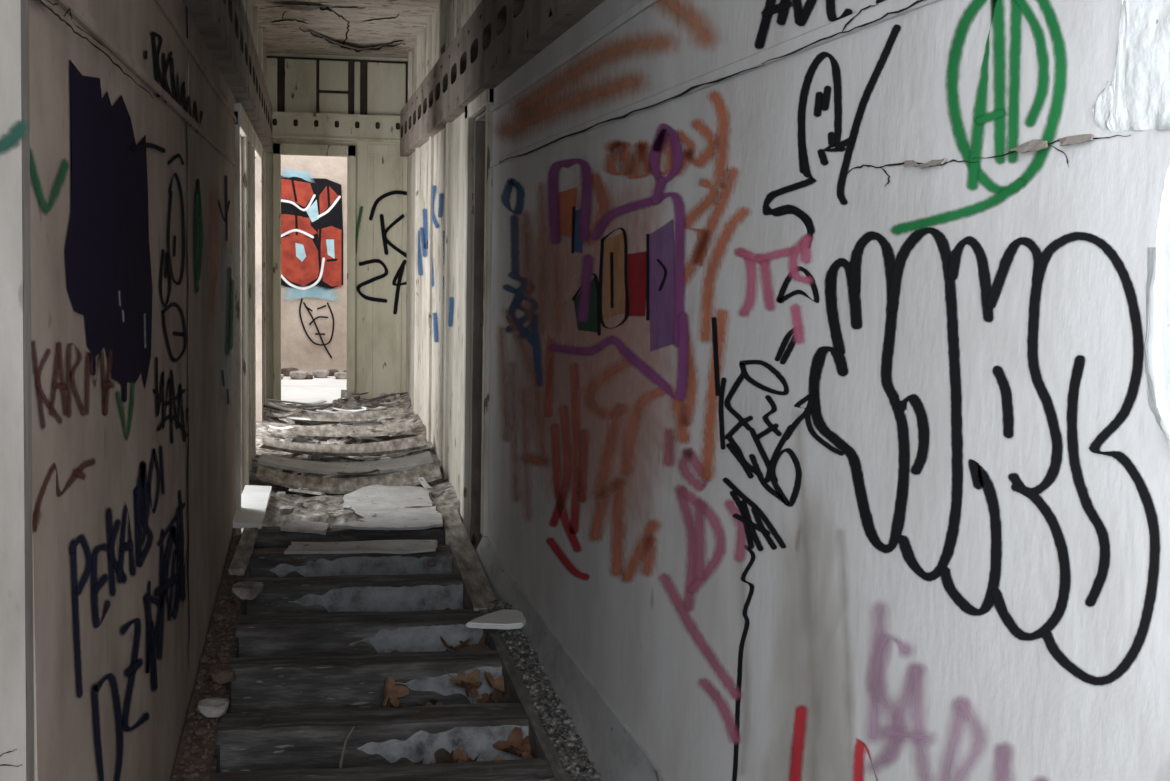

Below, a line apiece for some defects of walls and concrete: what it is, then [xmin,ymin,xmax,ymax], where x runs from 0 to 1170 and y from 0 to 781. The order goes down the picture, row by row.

flaking render [1092,0,1170,132]
crack [844,134,1131,187]
peeling [1144,247,1170,448]